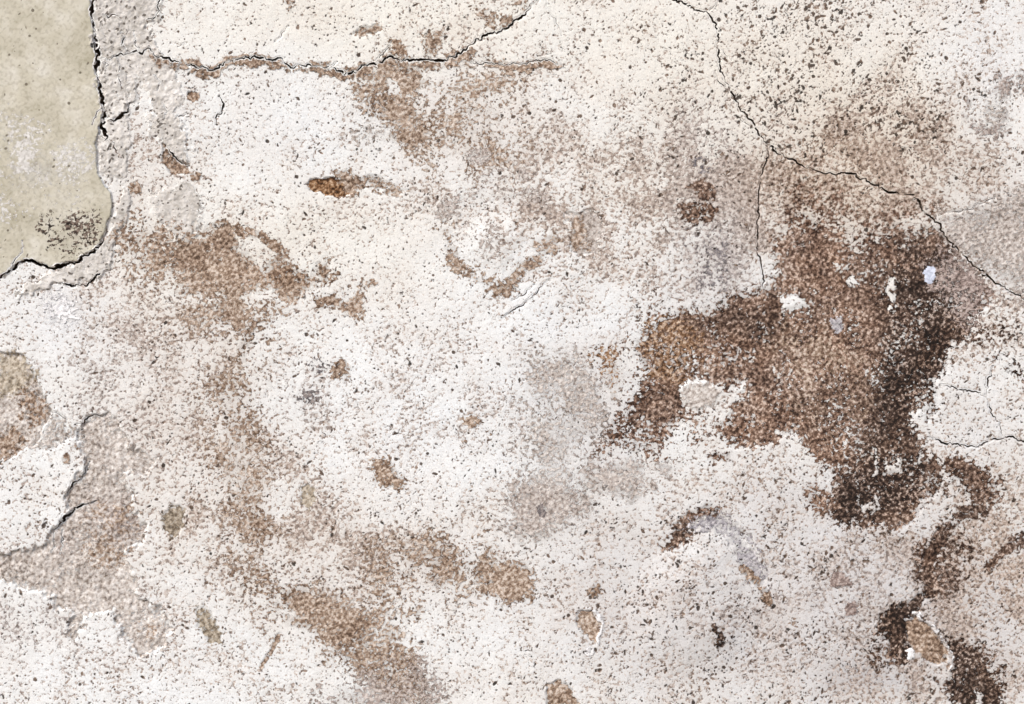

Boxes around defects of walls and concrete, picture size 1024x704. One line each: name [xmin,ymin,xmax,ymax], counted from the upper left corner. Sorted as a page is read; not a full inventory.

crack [102,0,564,125]
crack [165,146,190,166]
crack [671,0,1024,302]
spalling [35,208,102,261]
water stain [934,182,1024,307]
spalling [0,348,81,465]
crack [50,461,97,554]
crack [51,410,106,425]
water stain [105,208,672,704]